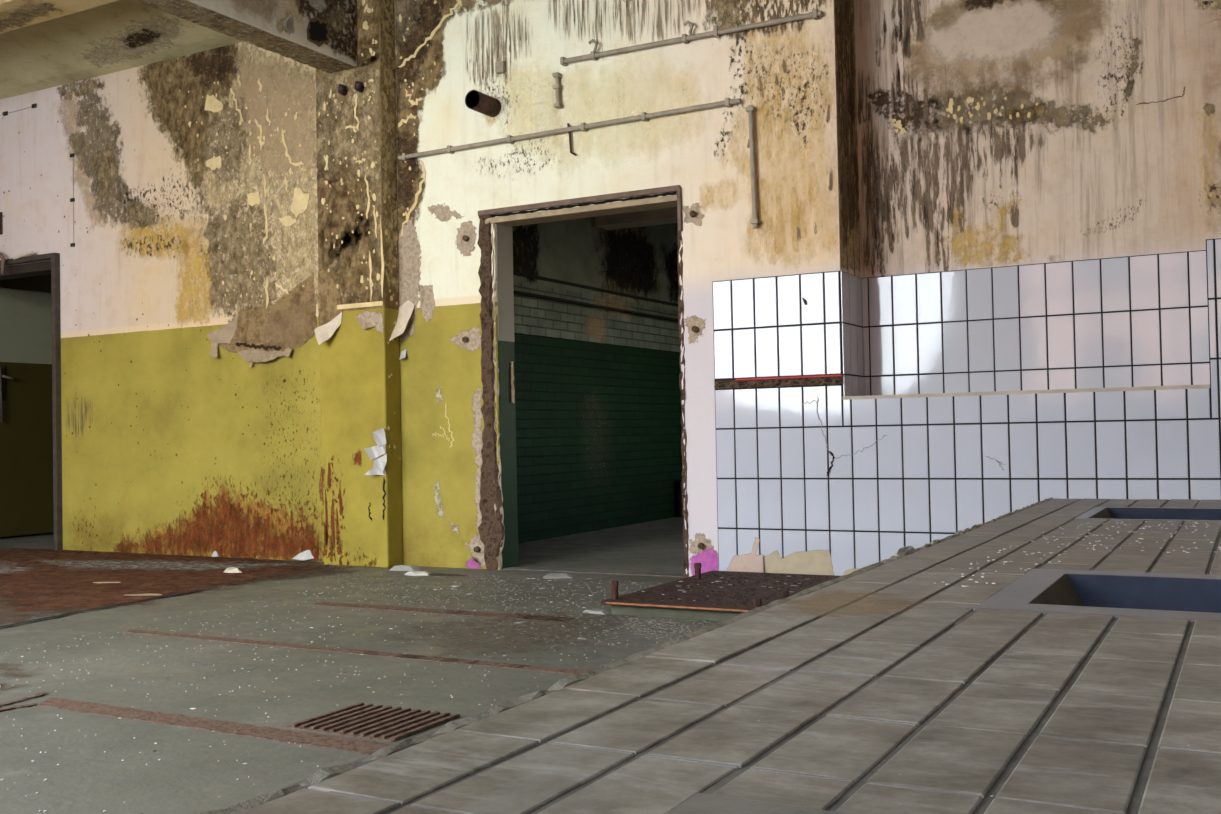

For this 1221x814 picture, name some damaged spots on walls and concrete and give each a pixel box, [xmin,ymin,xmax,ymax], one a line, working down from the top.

leakage [57,0,529,322]
leakage [479,145,550,175]
leakage [553,0,1143,276]
peeling [206,217,435,367]
spalling [428,203,476,256]
leakage [512,224,540,283]
leakage [589,217,679,339]
spalling [449,326,481,352]
crack [802,397,887,477]
rust [0,456,376,624]
spalling [727,538,861,575]